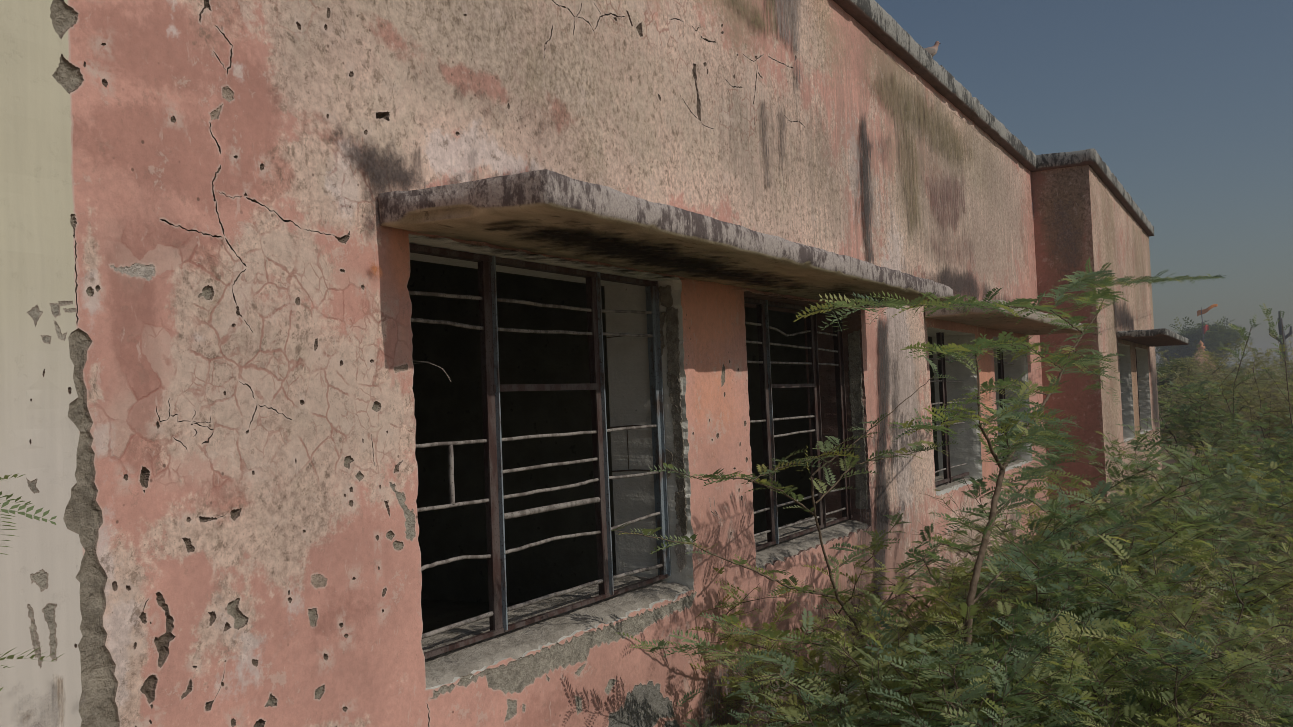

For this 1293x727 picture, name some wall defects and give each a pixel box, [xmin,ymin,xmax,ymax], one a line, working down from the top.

spalling [50,0,86,94]
crack [544,0,625,58]
crack [726,54,805,128]
crack [160,0,331,332]
damp [858,115,976,265]
spalling [26,285,176,727]
crack [156,398,213,449]
crack [239,381,292,434]
damp [425,221,899,727]
peeling [659,285,694,572]
spalling [208,598,249,633]
peeling [430,591,697,727]